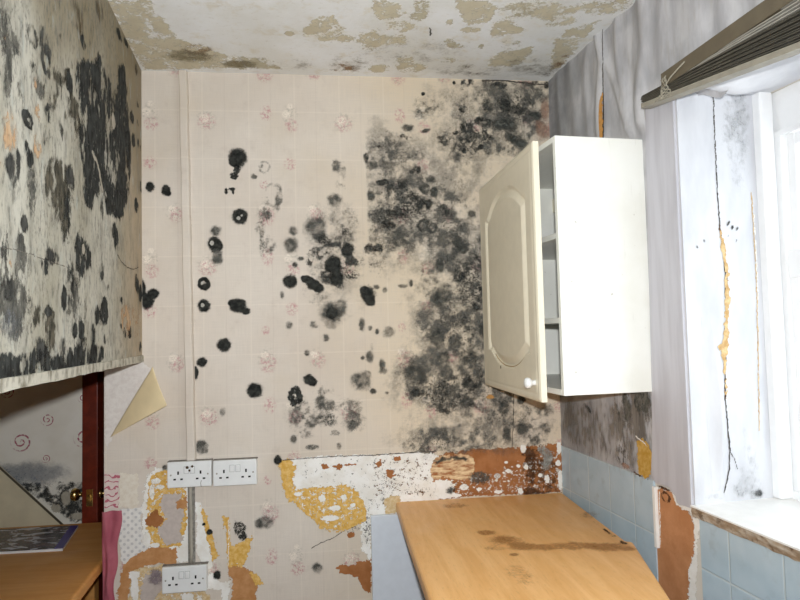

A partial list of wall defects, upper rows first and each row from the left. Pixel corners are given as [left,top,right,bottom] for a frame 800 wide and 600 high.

water stain [0,6,171,379]
water stain [224,148,247,194]
water stain [422,68,549,160]
water stain [228,298,250,315]
water stain [281,106,551,445]
crack [713,97,738,492]
crack [751,194,760,431]
peeling [111,367,167,437]
peeling [116,467,264,600]
peeling [278,442,563,593]
peeling [623,436,652,479]
flaking render [657,485,700,600]